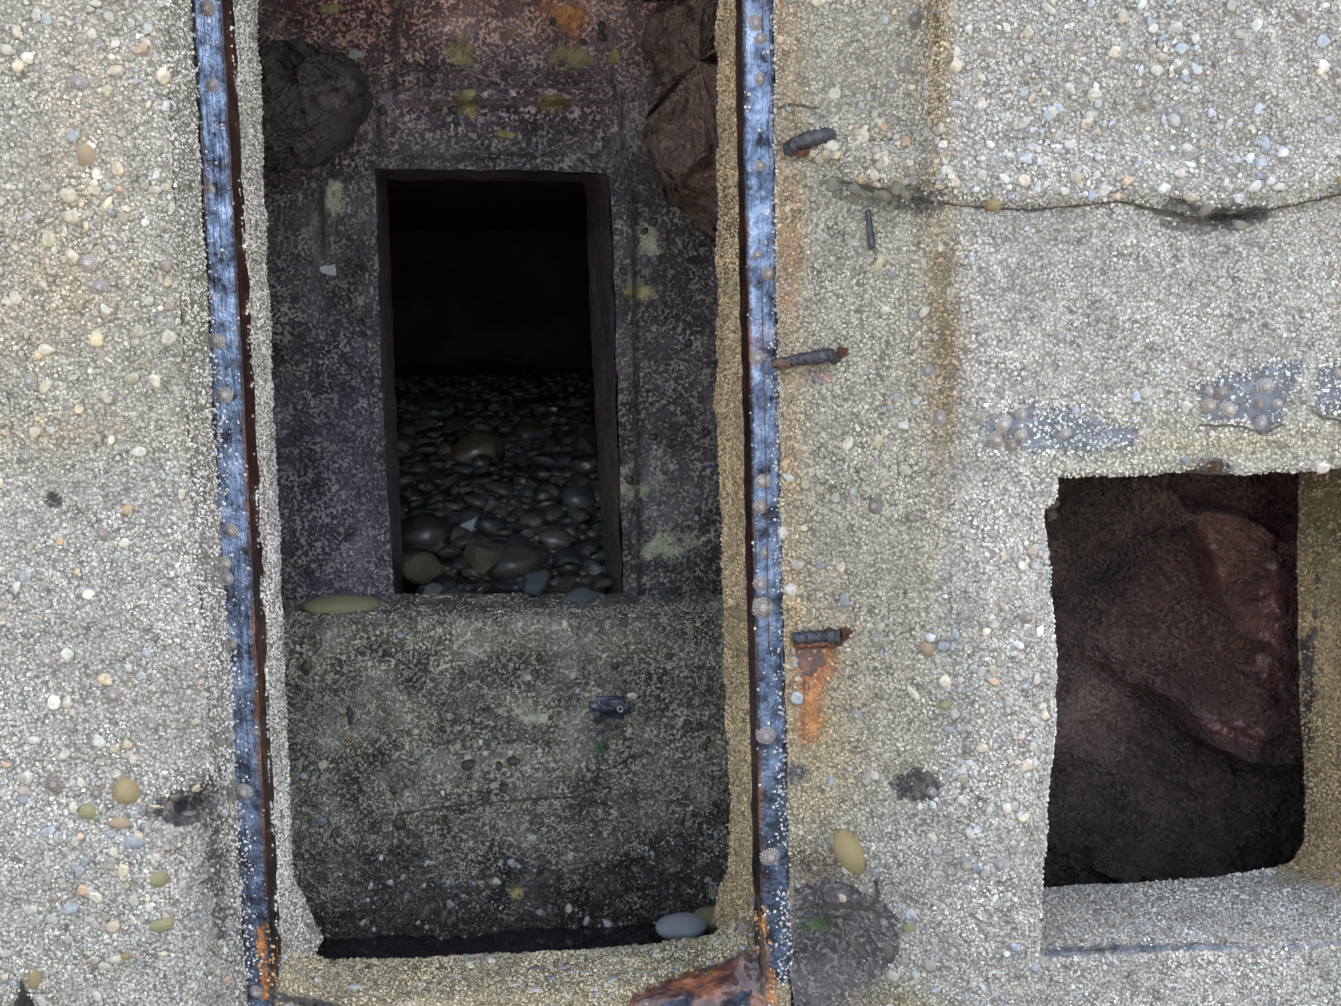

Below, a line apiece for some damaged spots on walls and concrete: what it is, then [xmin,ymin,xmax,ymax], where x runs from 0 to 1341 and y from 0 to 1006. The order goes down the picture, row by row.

crack [839,180,1341,226]
corrosion [793,625,853,752]
corrosion [627,907,778,1006]